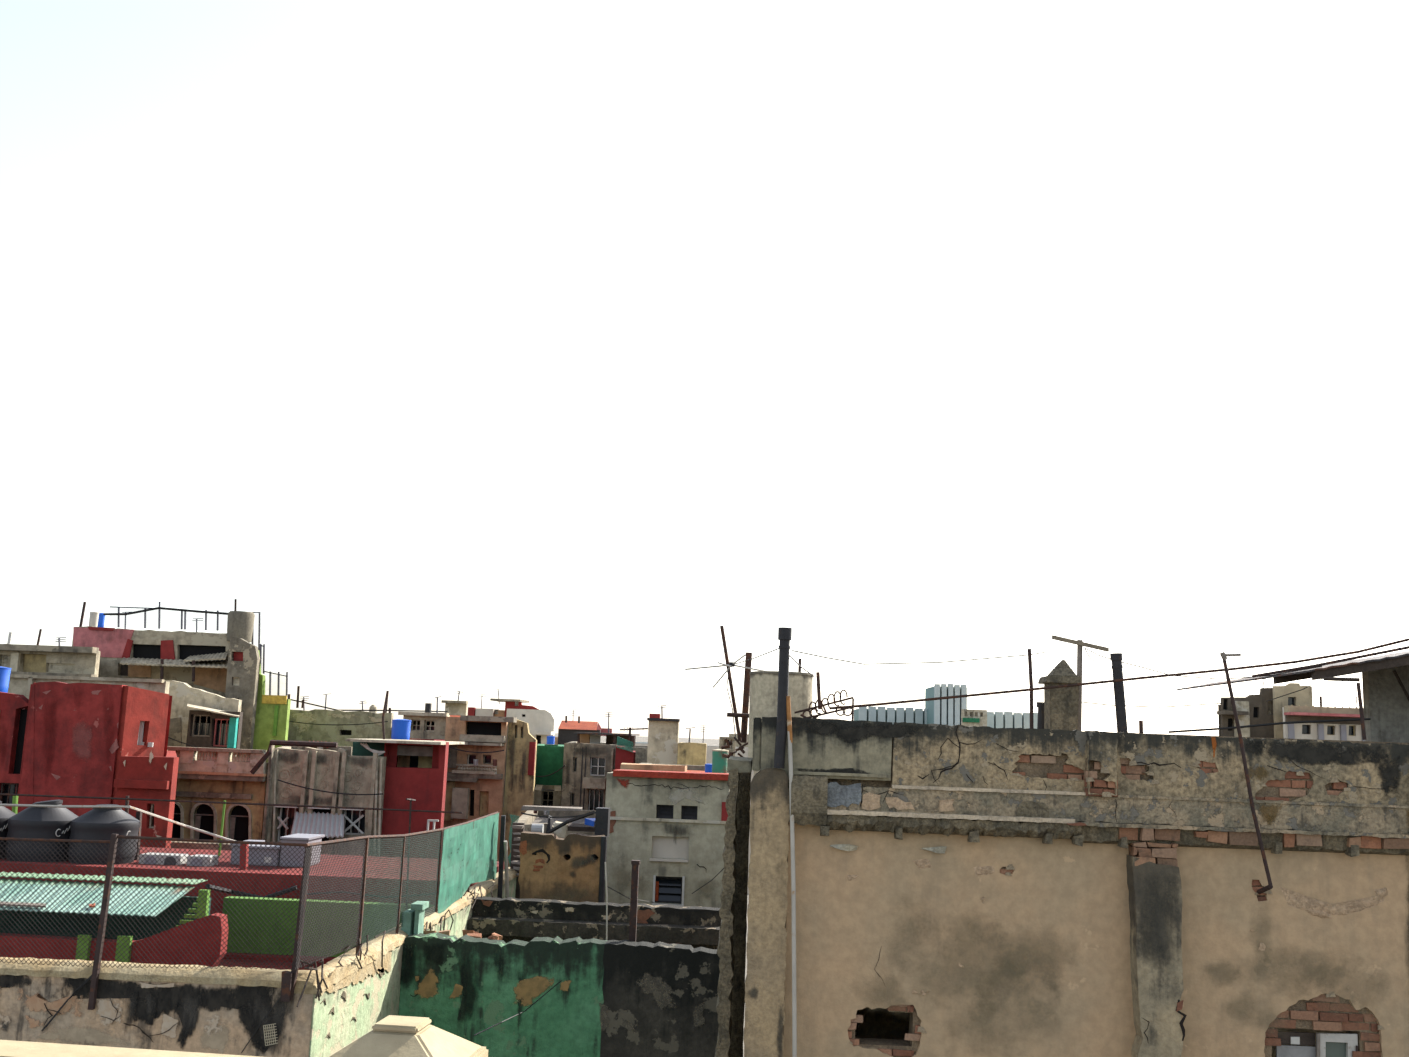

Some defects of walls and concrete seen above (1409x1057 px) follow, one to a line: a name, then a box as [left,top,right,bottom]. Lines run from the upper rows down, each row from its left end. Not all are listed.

crack [860,726,1018,806]
flaking render [1011,753,1160,797]
flaking render [1255,771,1352,801]
peeling [0,989,122,1028]
peeling [161,1014,179,1038]
damp [400,945,443,984]
flaking render [414,969,463,999]
damp [457,961,477,1021]
flaking render [514,976,571,1006]
spalling [848,990,928,1057]
flaking render [1264,991,1384,1057]